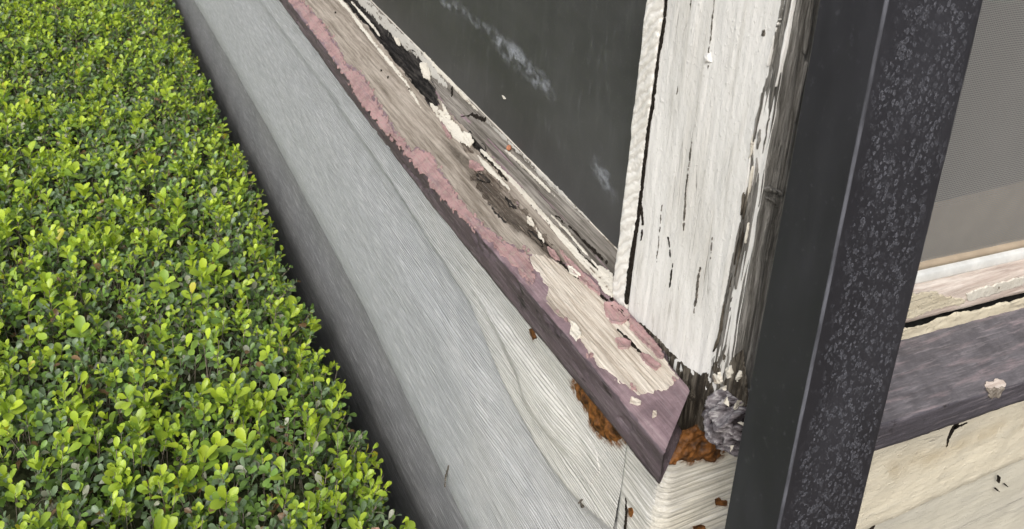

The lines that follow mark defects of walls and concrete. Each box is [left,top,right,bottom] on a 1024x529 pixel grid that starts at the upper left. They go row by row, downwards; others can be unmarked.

peeling [288,0,679,406]
peeling [710,0,814,426]
peeling [906,276,1024,319]
rust [571,379,626,447]
rust [669,425,725,465]
crack [946,422,968,447]